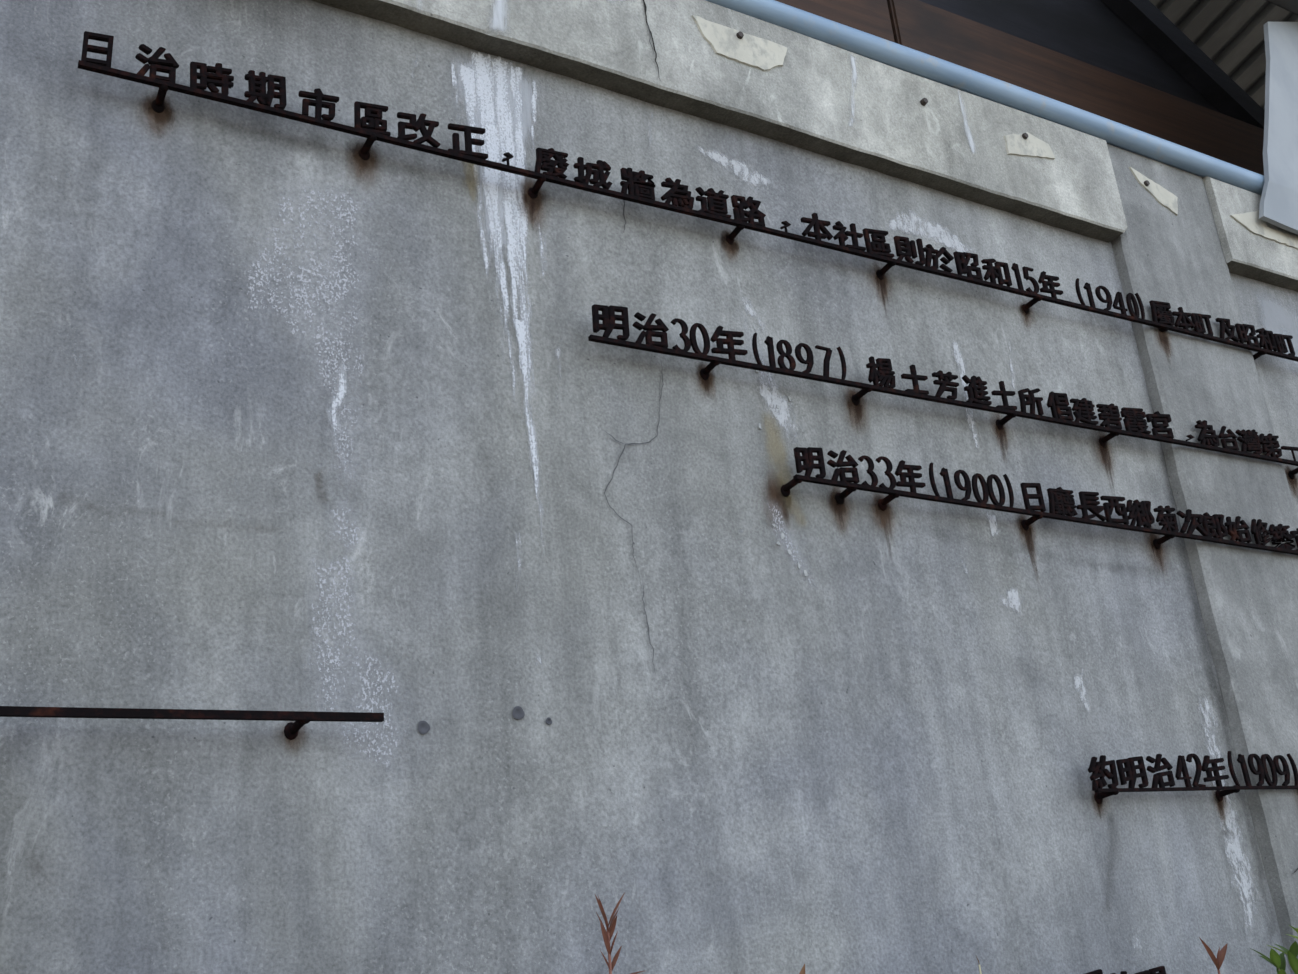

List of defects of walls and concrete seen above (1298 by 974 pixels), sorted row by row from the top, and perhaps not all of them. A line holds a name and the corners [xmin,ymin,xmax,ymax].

crack [643,0,660,79]
efflorescence [451,52,545,511]
rust [876,269,887,306]
crack [604,363,664,670]
rust [770,482,791,519]
rust [1019,518,1037,571]
damp [1199,699,1256,932]